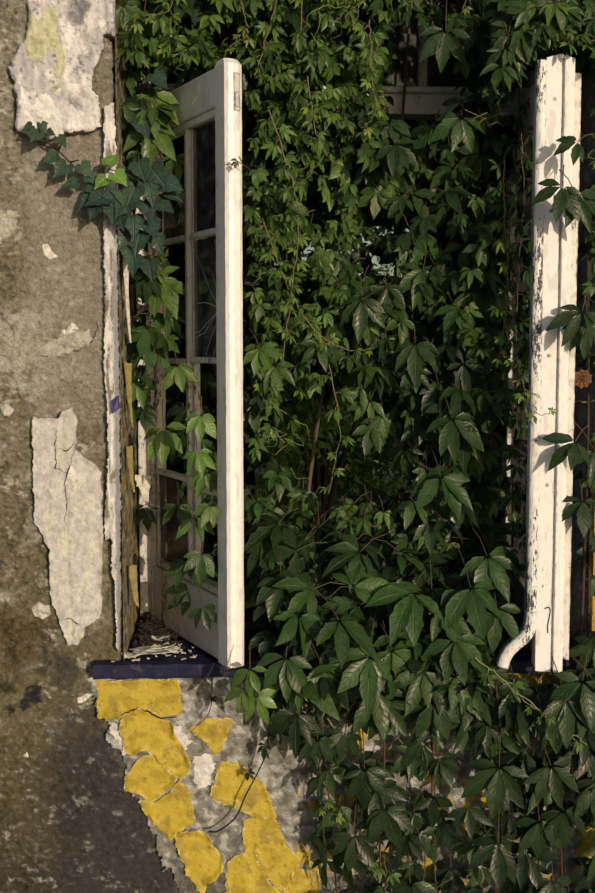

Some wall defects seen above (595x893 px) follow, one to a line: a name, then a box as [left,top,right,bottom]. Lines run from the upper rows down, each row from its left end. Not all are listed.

crack [54,423,76,542]
flaking render [31,407,105,645]
peeling [77,678,321,893]